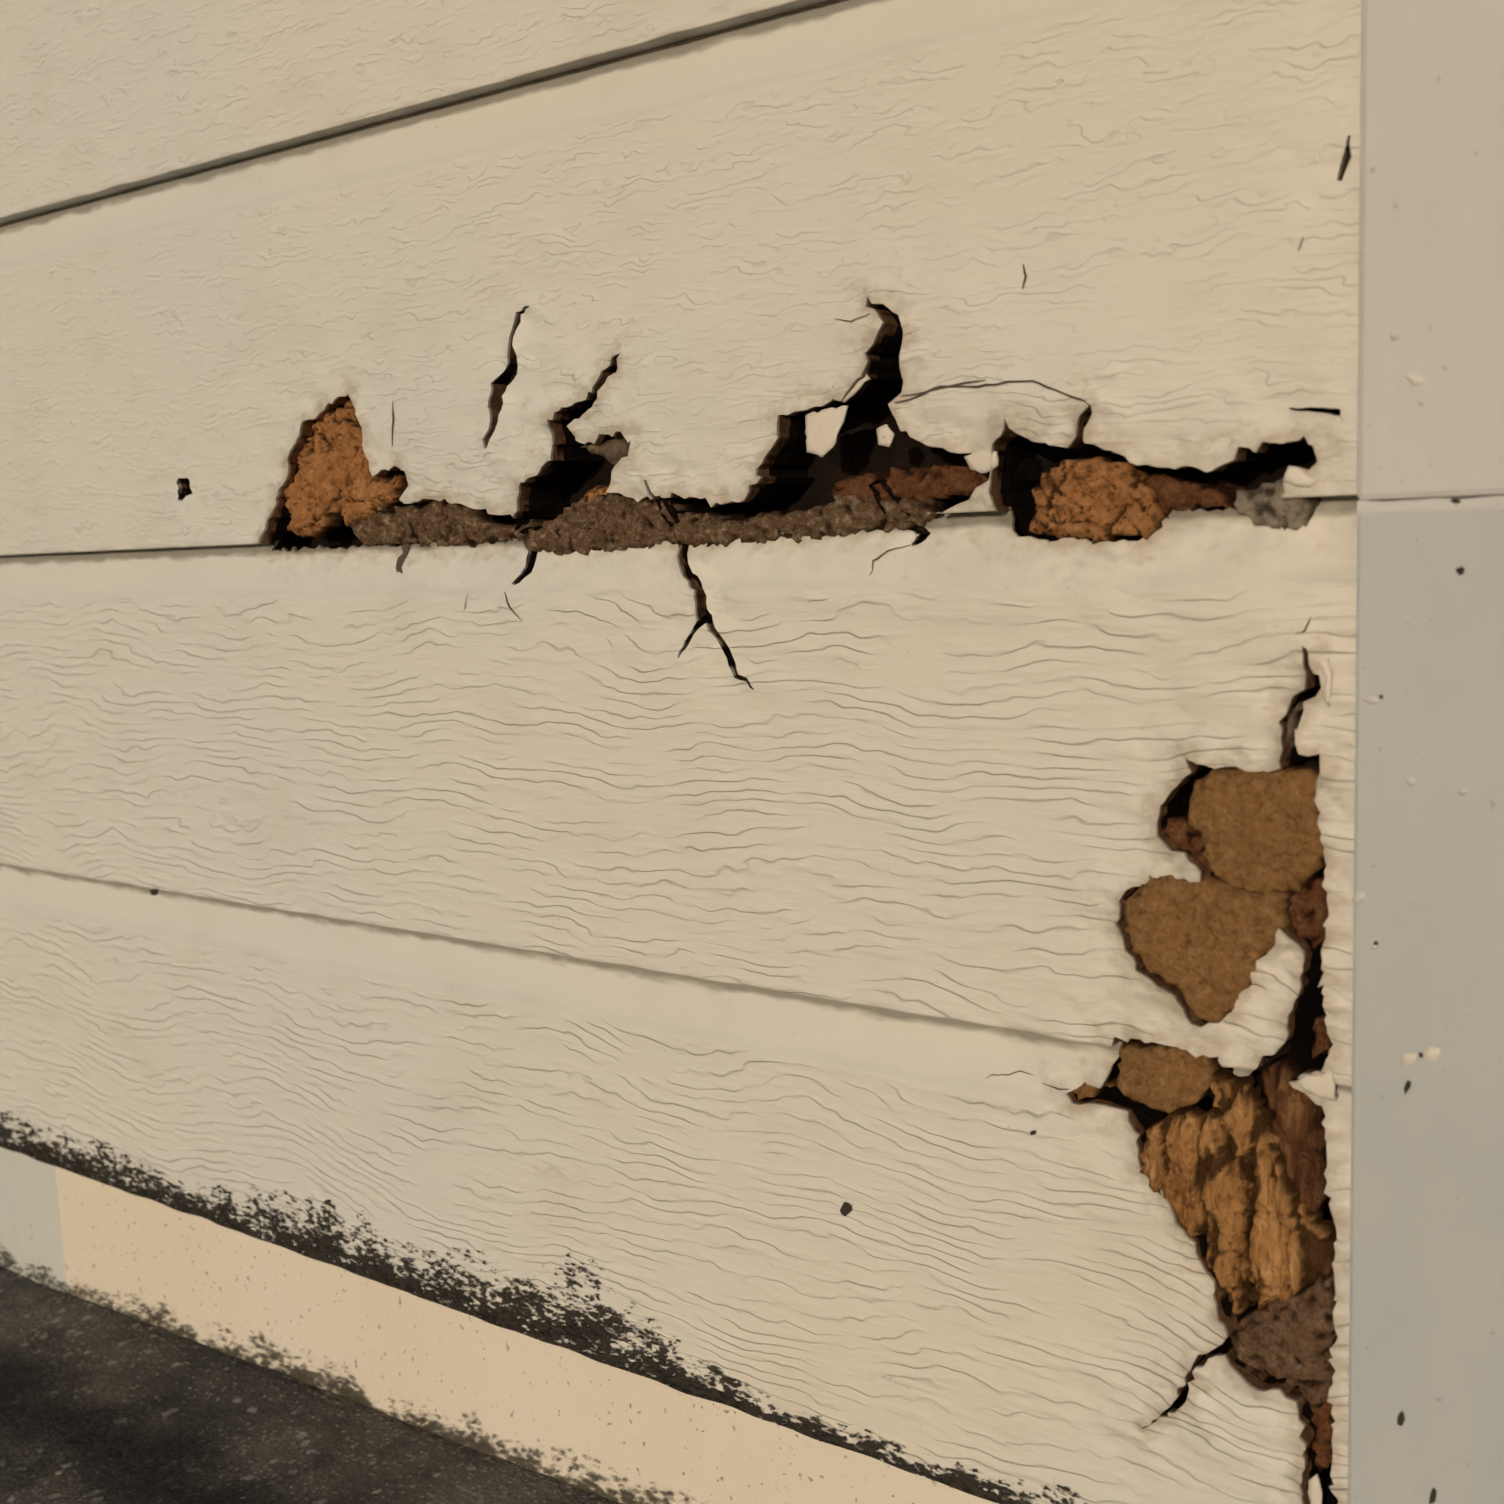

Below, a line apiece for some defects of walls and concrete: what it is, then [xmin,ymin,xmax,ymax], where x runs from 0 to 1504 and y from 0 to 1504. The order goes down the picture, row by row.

spalling [268,420,363,551]
crack [493,354,518,410]
spalling [493,395,615,533]
spalling [647,304,1318,541]
crack [646,481,754,690]
spalling [1161,764,1214,875]
spalling [1283,674,1321,723]
spalling [1285,745,1320,768]
spalling [1221,926,1337,1106]
spalling [1073,1039,1170,1147]
mould [0,1111,1086,1504]
spalling [1164,1234,1338,1504]